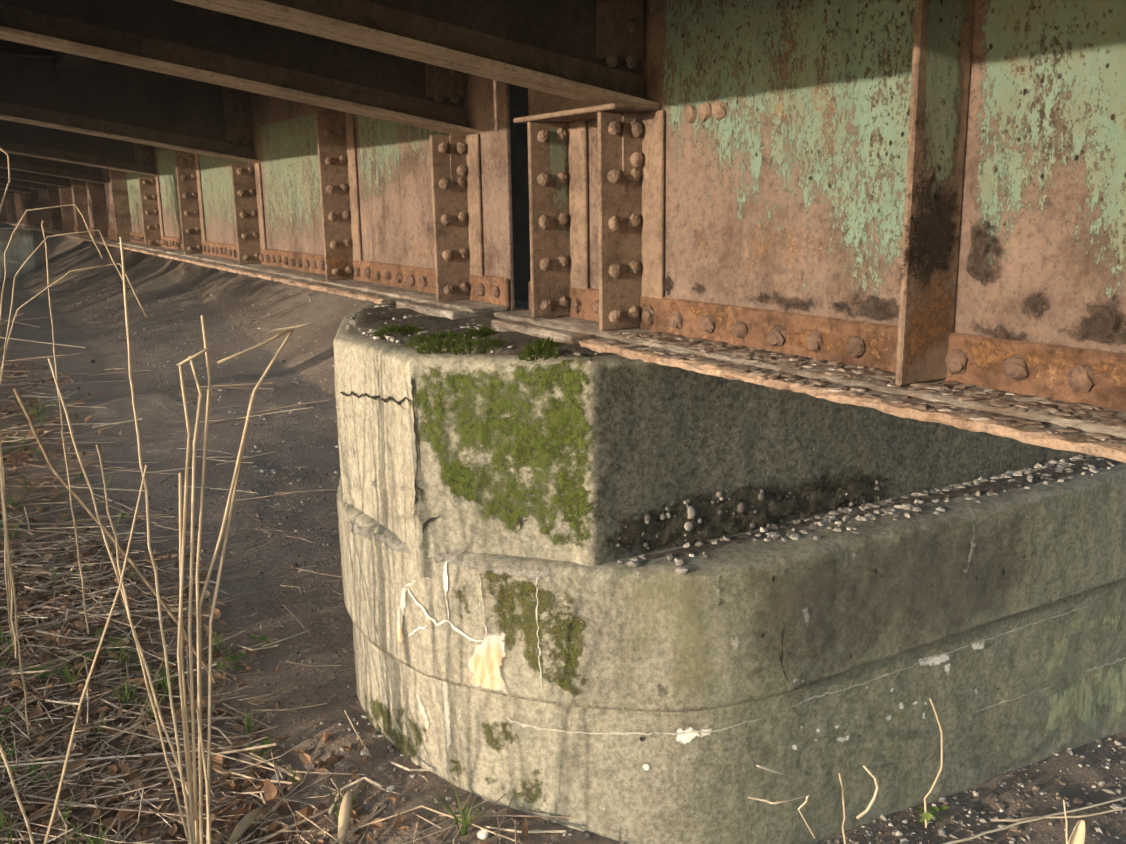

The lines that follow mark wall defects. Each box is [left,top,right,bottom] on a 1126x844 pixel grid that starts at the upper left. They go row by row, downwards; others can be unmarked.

peeling [662,0,970,307]
peeling [972,0,1126,303]
corrosion [750,293,814,312]
corrosion [829,120,1000,379]
corrosion [965,292,1126,375]
crack [340,374,439,533]
crack [405,561,487,642]
crack [534,572,542,688]